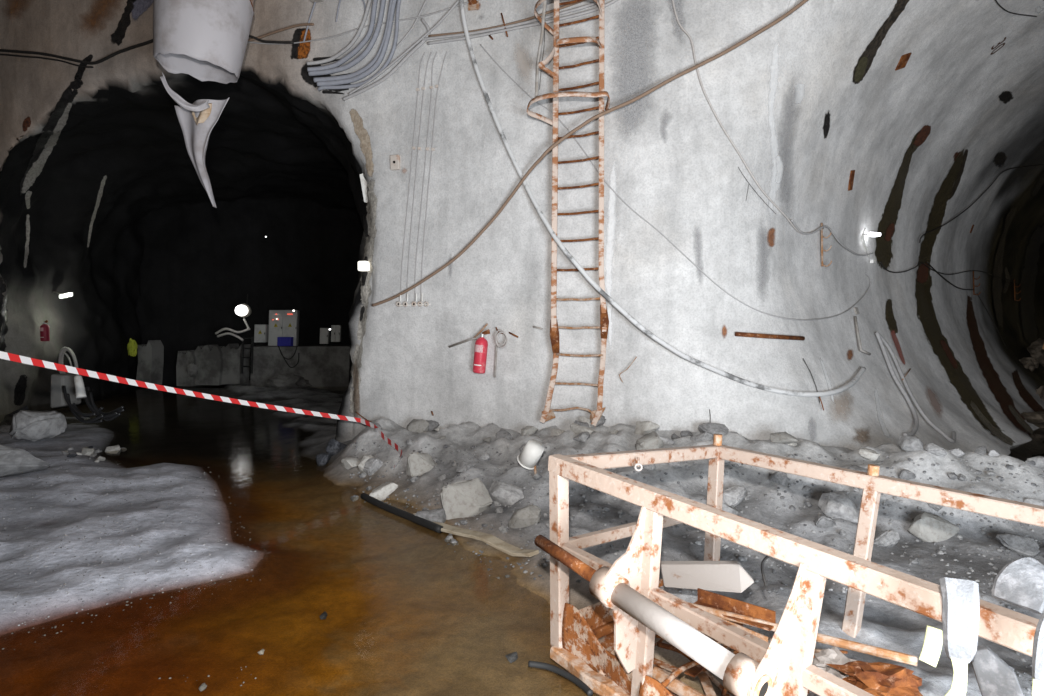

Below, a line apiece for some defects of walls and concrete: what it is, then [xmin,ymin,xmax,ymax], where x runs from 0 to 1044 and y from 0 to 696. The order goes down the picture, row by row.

water stain [111,0,154,46]